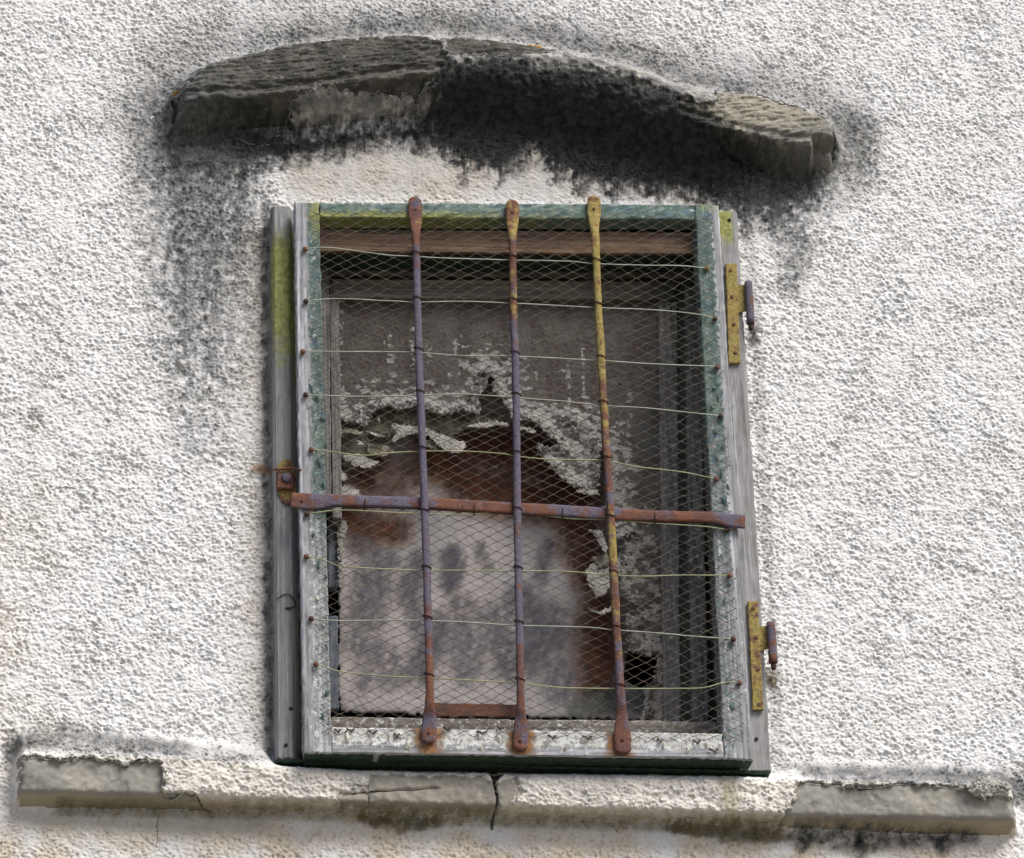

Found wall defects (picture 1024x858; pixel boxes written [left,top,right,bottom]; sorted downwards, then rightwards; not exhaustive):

damp [136,24,871,373]
peeling [312,416,467,495]
peeling [467,420,536,434]
peeling [536,448,561,467]
spalling [16,756,211,813]
crack [490,774,502,818]
spalling [779,773,1017,834]